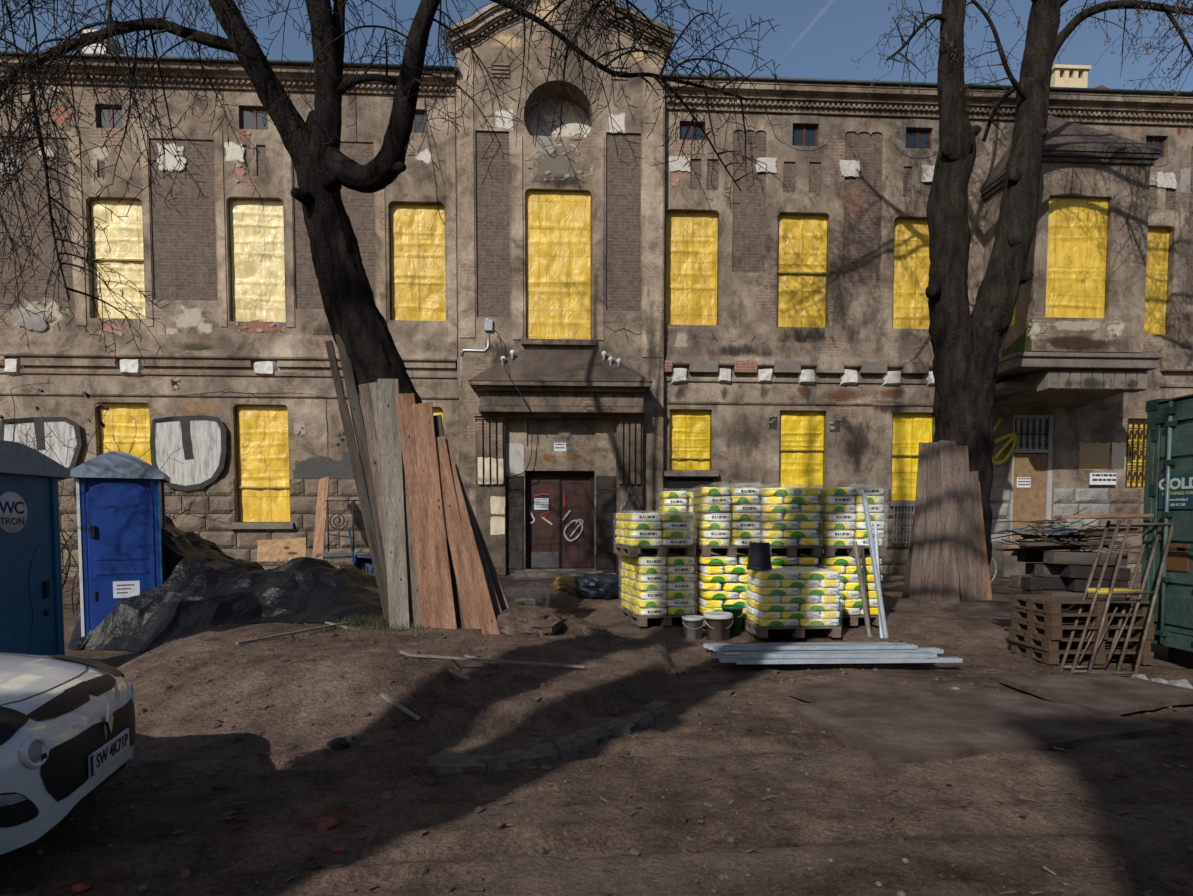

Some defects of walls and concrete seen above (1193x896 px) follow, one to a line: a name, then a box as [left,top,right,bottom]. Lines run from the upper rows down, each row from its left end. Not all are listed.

peeling [3,298,69,332]
flaking render [91,318,134,336]
peeling [165,304,213,334]